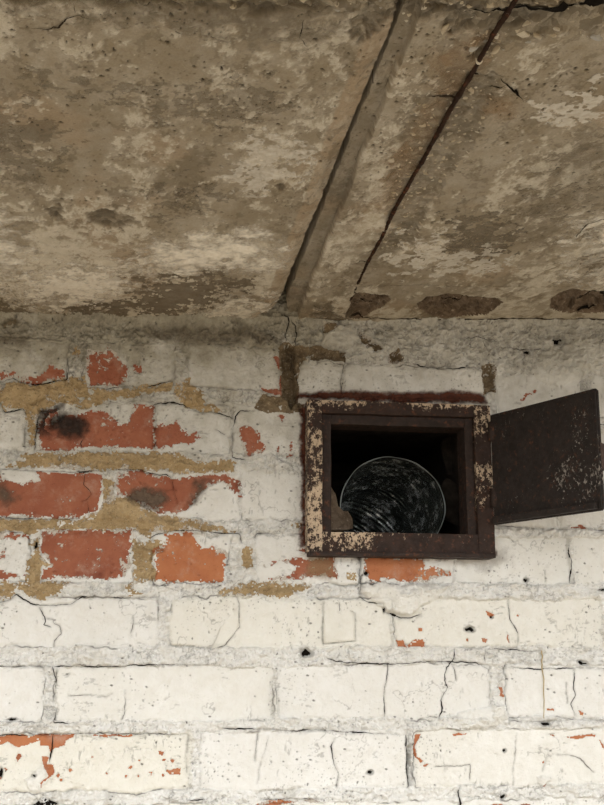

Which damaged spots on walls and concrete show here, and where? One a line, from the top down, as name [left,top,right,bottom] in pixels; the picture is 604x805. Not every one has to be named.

crack [469,0,604,13]
spalling [376,0,604,261]
leakage [430,210,528,267]
leakage [0,283,32,329]
leakage [50,270,279,319]
spalling [417,293,503,318]
peeling [0,342,451,601]
corrosion [297,390,488,547]
crack [50,664,199,688]
crack [322,607,598,722]
crack [0,695,187,762]
peeling [0,734,74,784]